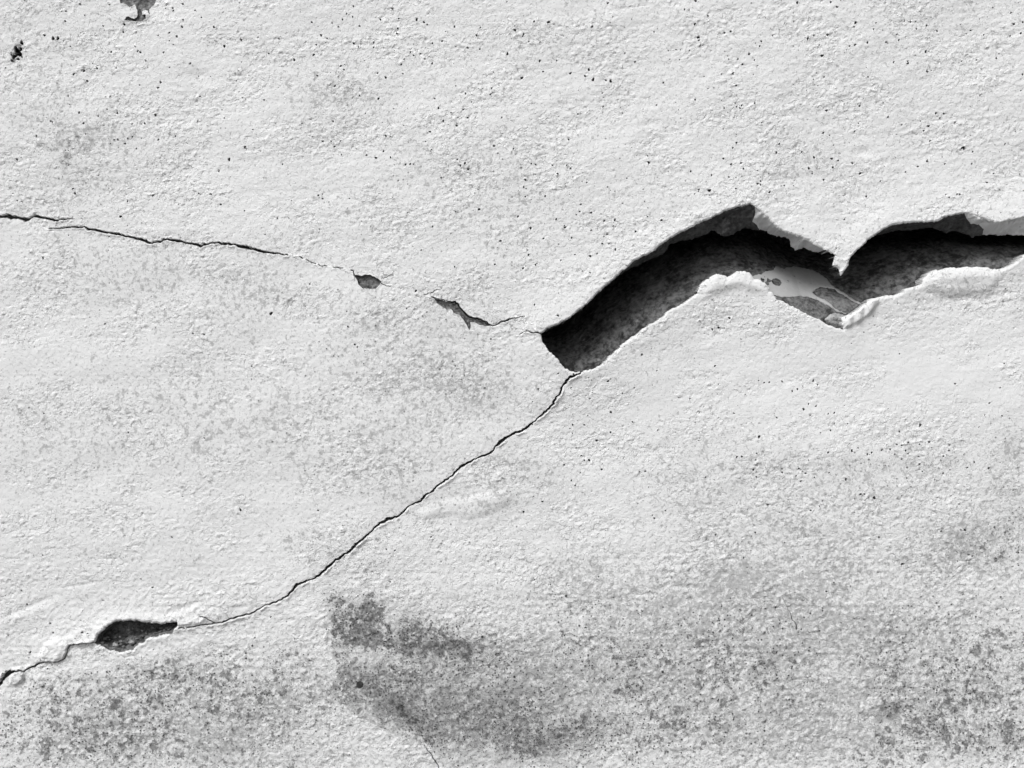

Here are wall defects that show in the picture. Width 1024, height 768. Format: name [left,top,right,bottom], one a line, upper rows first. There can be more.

crack [0,213,355,279]
crack [491,315,542,335]
flaking render [541,204,1024,375]
crack [176,370,587,632]
crack [0,640,95,686]
flaking render [89,616,181,657]
damp [323,584,515,667]
damp [356,681,444,754]